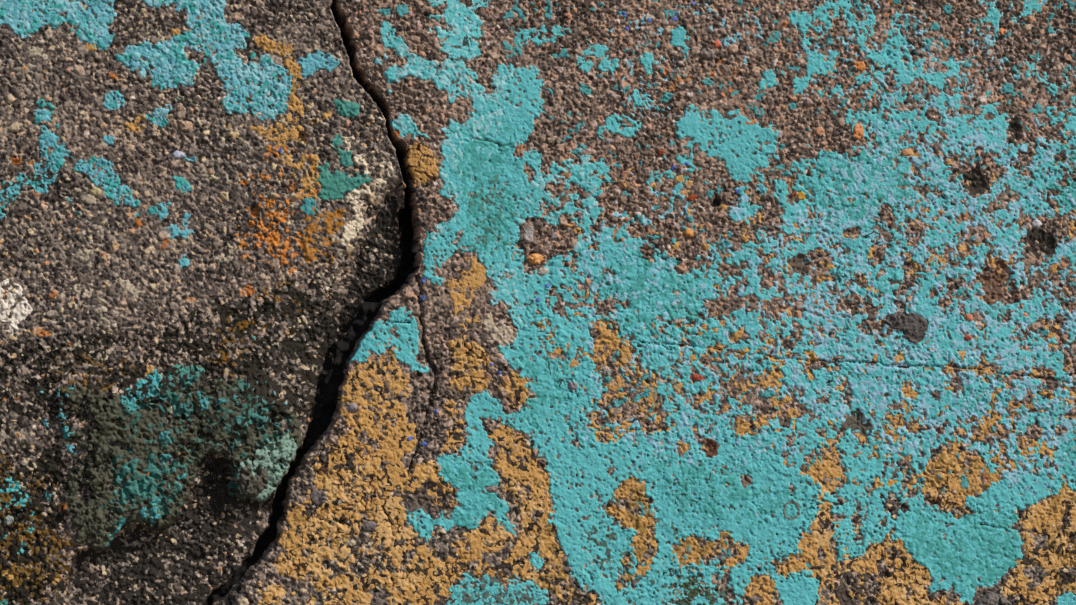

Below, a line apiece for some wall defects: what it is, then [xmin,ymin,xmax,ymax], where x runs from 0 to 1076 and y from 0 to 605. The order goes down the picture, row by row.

spalling [1008,114,1022,144]
spalling [339,136,394,246]
spalling [963,168,990,195]
spalling [1024,228,1058,257]
spalling [789,253,810,274]
spalling [979,259,1019,305]
crack [203,1,515,605]
spalling [483,312,515,352]
spalling [841,411,873,438]
spalling [697,438,720,458]
spalling [406,479,447,516]
spalling [1061,499,1074,530]